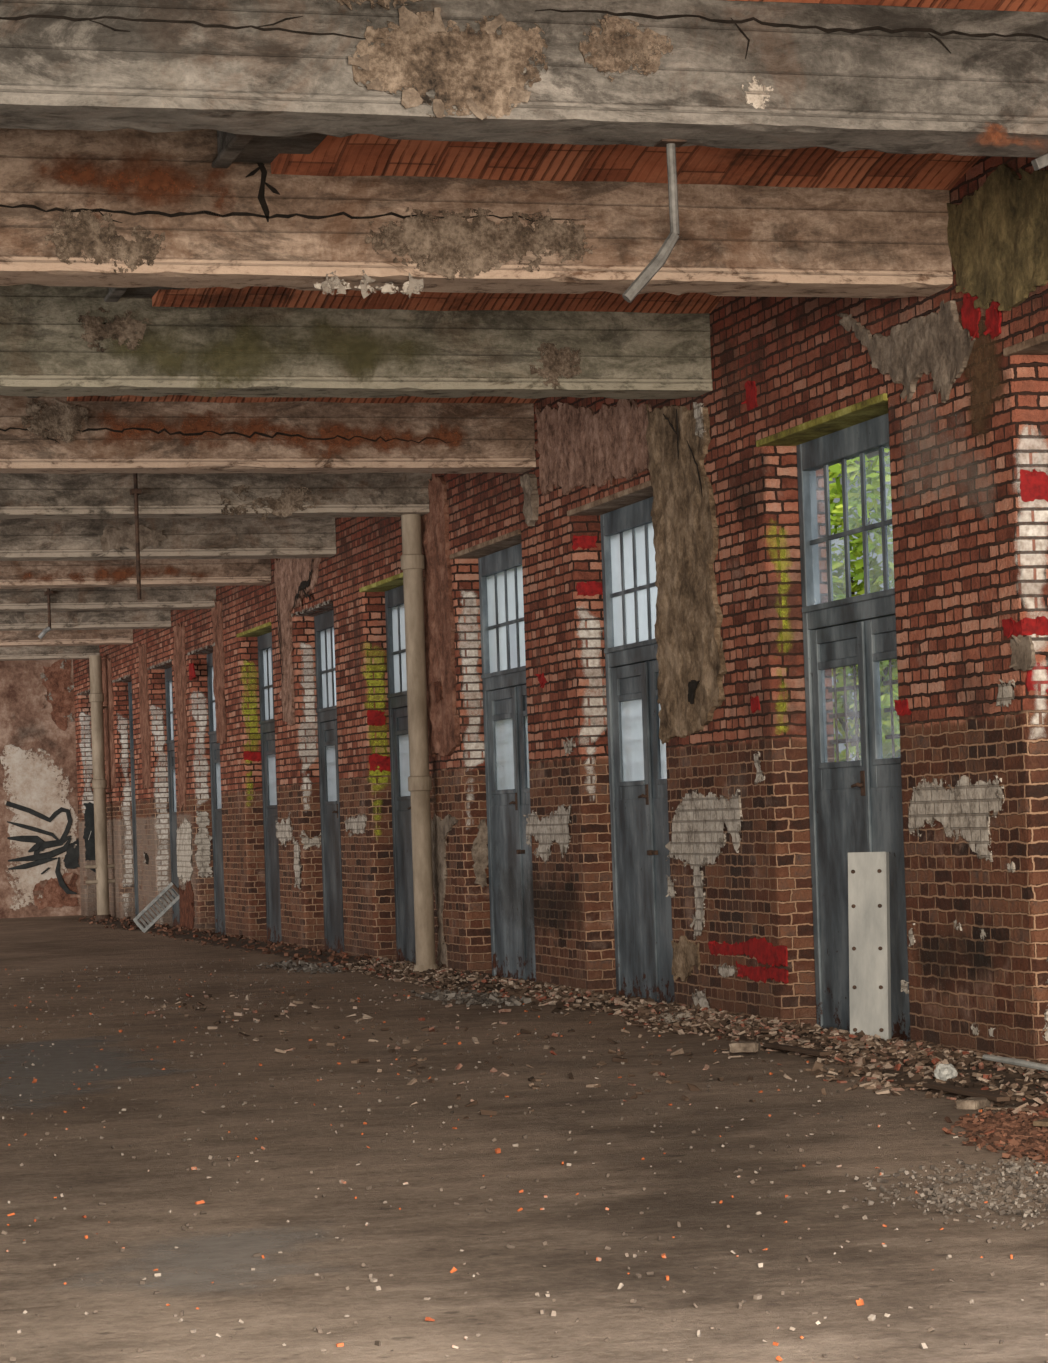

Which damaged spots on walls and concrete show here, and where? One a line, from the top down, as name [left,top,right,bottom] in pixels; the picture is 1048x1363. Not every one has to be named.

crack [535,9,1048,59]
crack [0,163,576,223]
peeling [692,402,707,438]
spalling [40,659,75,731]
spalling [688,680,700,704]
peeling [753,751,765,785]
peeling [0,744,81,911]
peeling [908,775,1005,862]
peeling [665,788,743,1010]